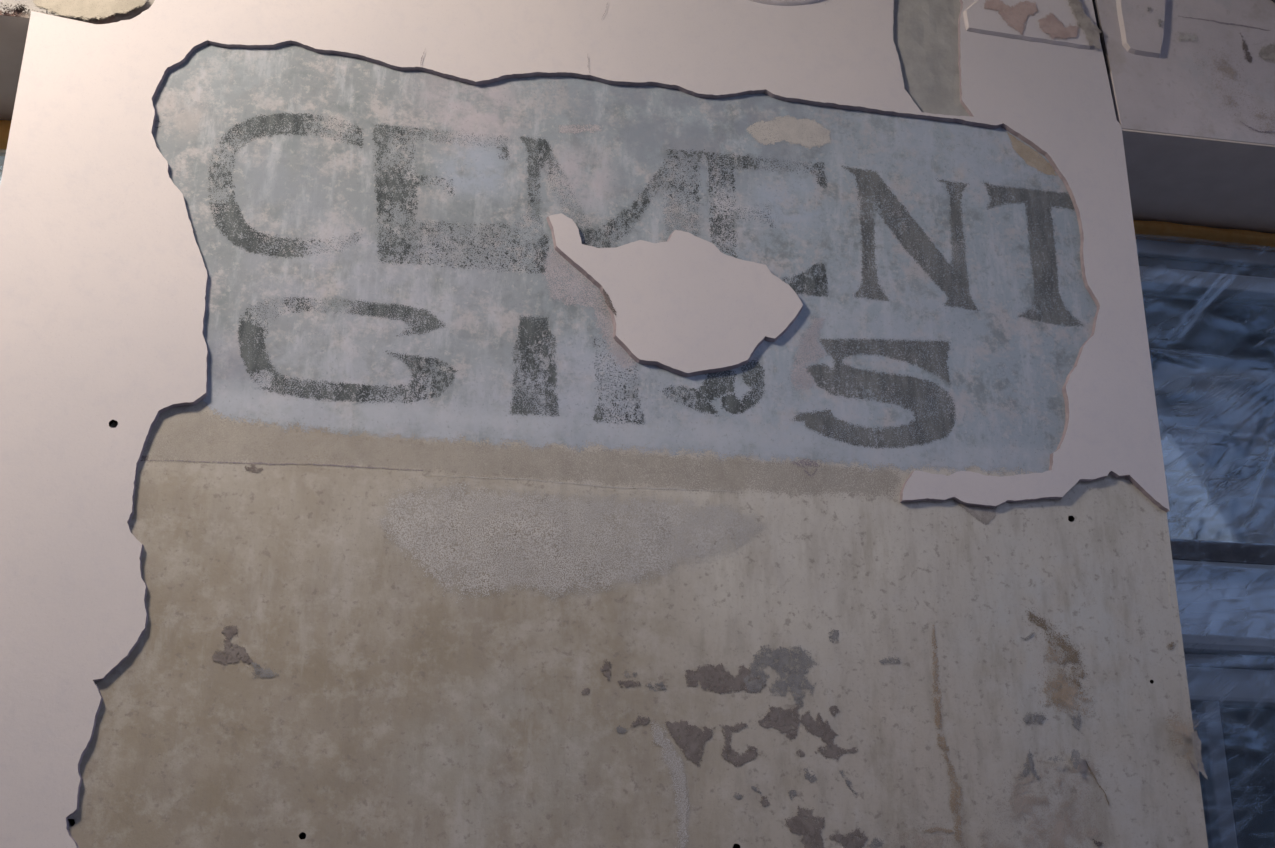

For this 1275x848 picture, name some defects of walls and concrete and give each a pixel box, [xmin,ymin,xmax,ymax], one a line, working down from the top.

flaking render [0,0,155,24]
peeling [151,40,1100,470]
peeling [66,252,1208,848]